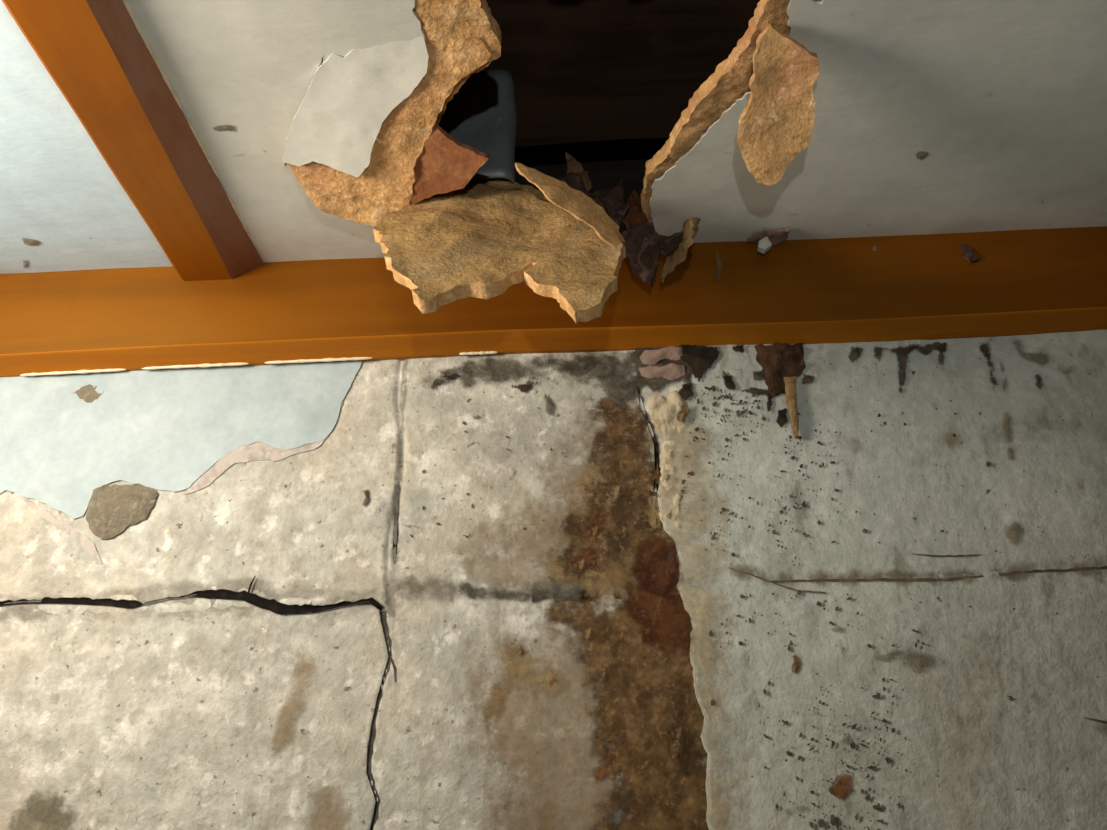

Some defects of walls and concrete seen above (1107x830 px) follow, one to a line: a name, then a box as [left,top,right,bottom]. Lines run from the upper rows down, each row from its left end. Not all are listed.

flaking render [748,227,790,246]
peeling [0,361,363,564]
damp [748,424,841,564]
damp [849,342,947,393]
damp [978,343,1006,388]
damp [1003,415,1013,459]
damp [1014,341,1048,390]
crack [0,359,407,830]
rust [407,394,709,830]
damp [424,345,802,830]
peeling [639,329,1107,830]